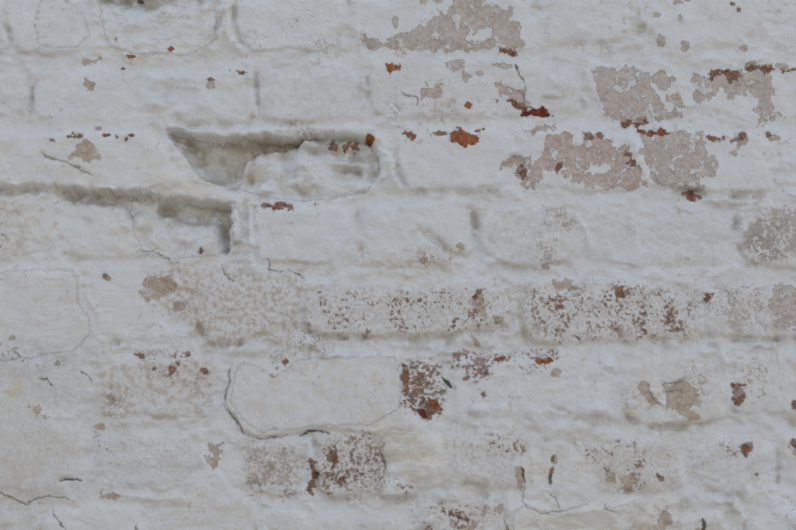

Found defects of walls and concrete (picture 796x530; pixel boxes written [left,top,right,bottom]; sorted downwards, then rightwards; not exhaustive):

peeling [363,0,525,83]
peeling [690,61,796,128]
spalling [433,127,485,148]
peeling [495,64,747,202]
peeling [745,208,796,259]
peeling [703,283,796,332]
spalling [400,361,452,419]